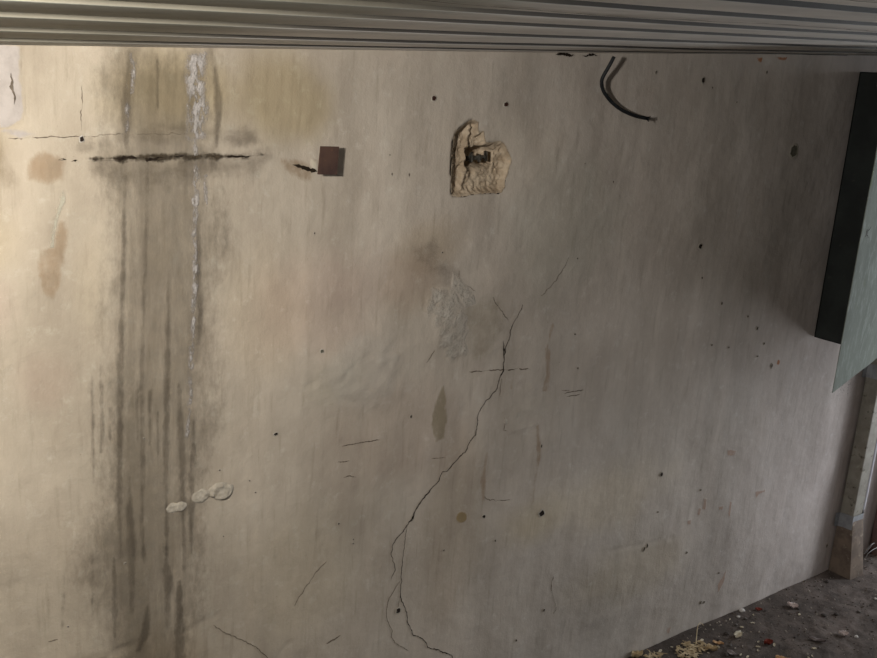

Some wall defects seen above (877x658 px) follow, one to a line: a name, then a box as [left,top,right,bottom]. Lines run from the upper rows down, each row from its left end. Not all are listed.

flaking render [450,120,512,197]
water stain [19,46,257,658]
crack [386,300,528,658]